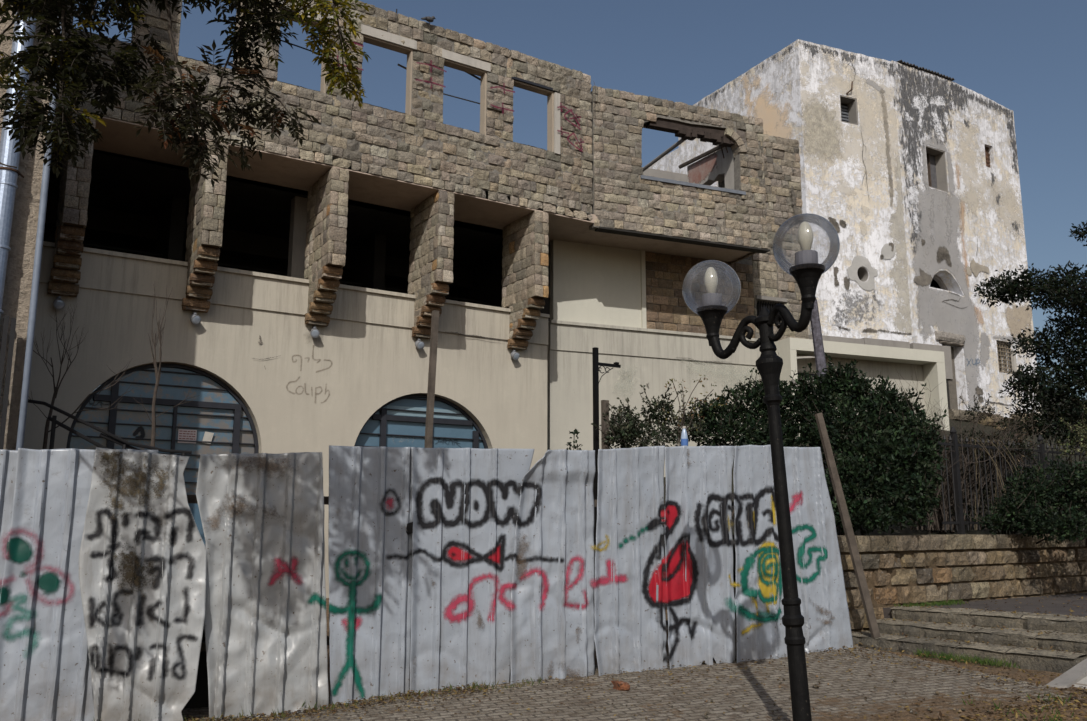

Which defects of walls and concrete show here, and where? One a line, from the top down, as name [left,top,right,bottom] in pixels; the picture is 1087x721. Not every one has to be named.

peeling [743,59,948,335]
damp [746,42,1019,253]
peeling [958,126,1023,235]
spalling [937,246,952,267]
peeling [966,258,989,277]
peeling [980,305,1032,370]